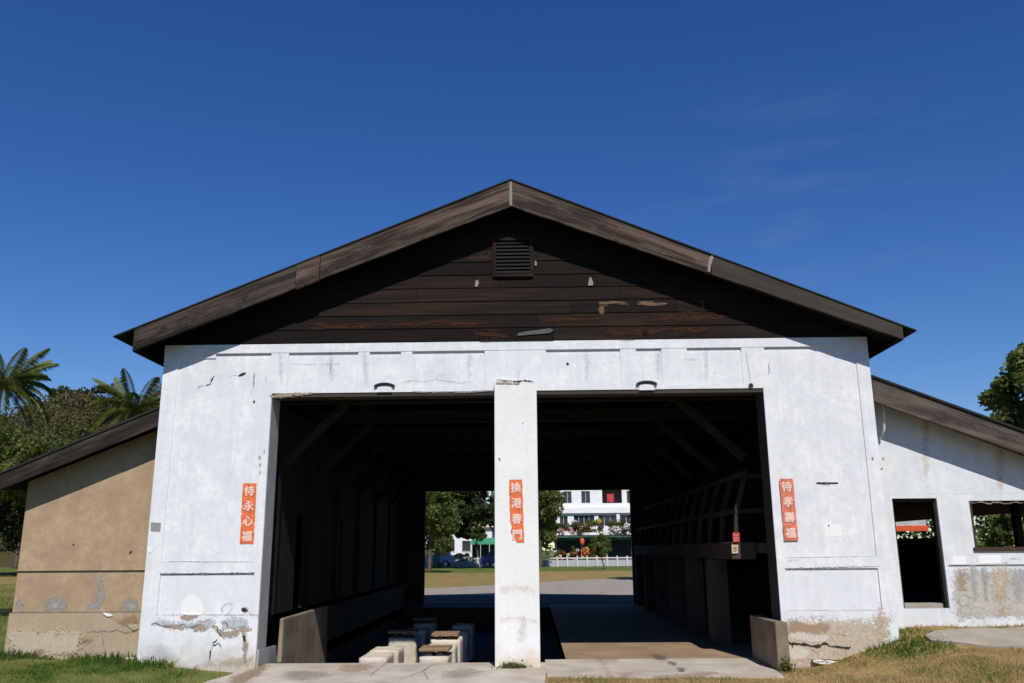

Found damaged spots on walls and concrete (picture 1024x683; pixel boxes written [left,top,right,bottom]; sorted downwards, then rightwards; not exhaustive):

flaking render [87,575,138,616]
flaking render [151,607,258,639]
flaking render [787,608,894,669]
water stain [951,565,1024,622]